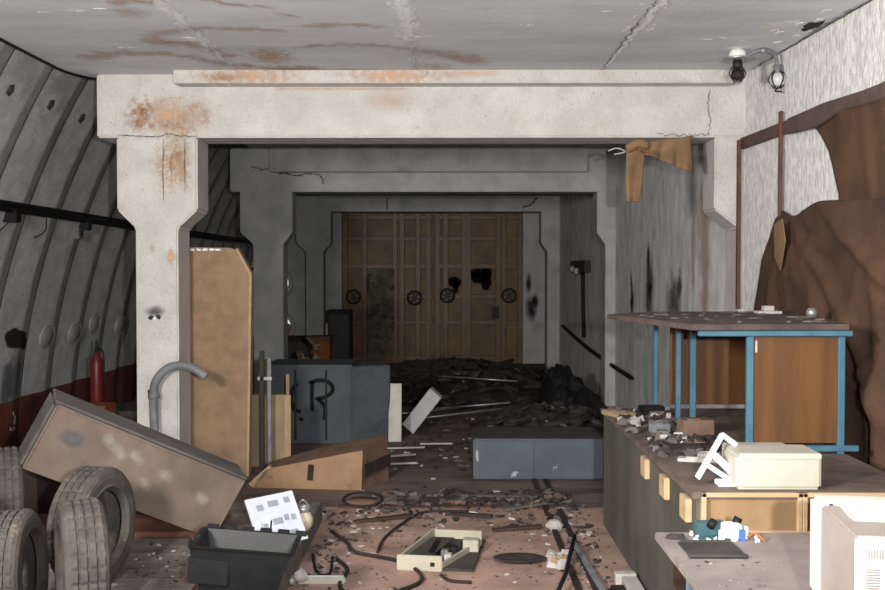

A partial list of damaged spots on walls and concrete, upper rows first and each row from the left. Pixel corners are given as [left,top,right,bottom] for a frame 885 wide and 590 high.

crack [151,0,237,70]
crack [387,0,435,70]
crack [601,0,669,70]
spalling [773,0,873,50]
corrosion [202,49,312,82]
corrosion [133,97,186,128]
crack [657,92,711,137]
crack [252,166,324,184]